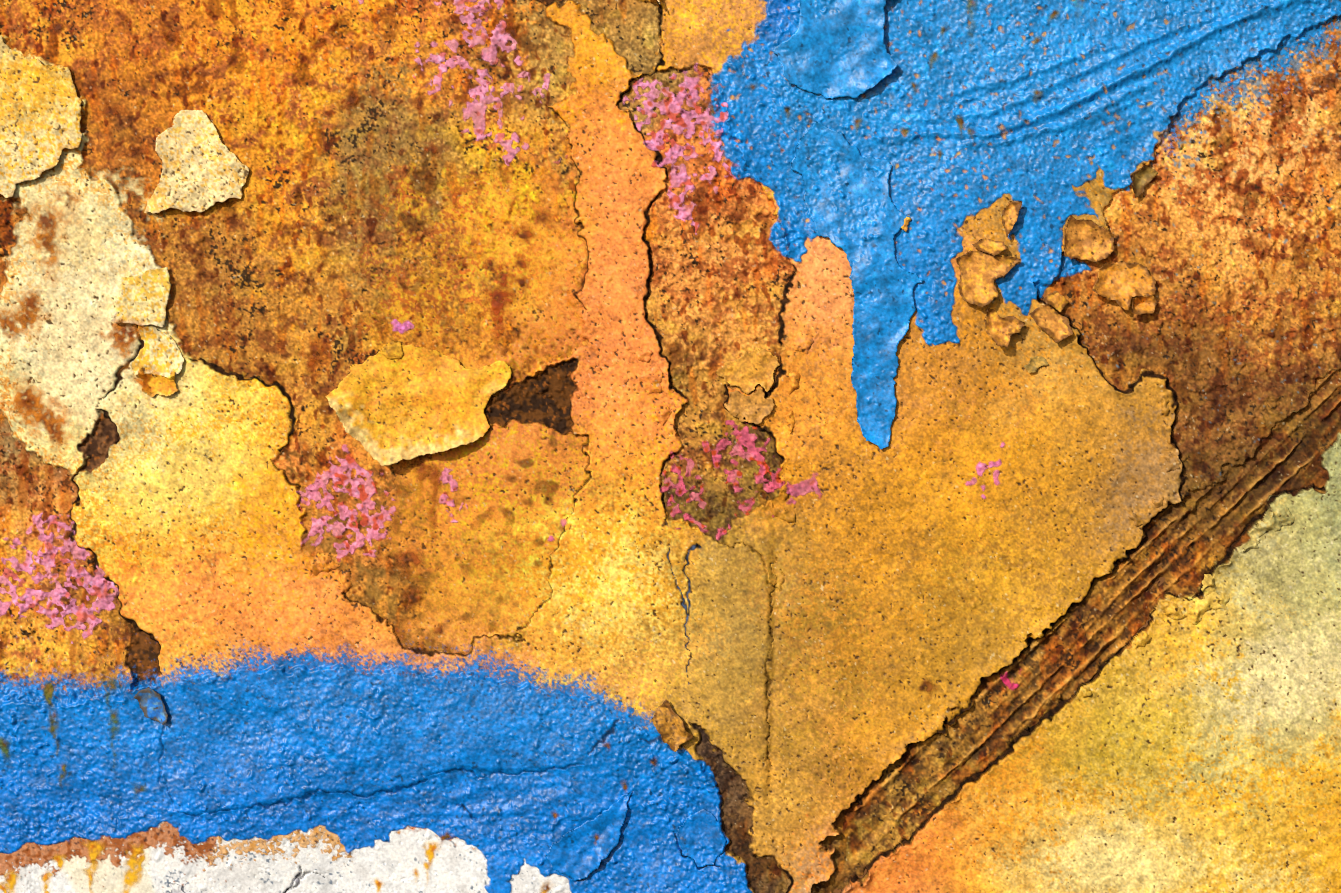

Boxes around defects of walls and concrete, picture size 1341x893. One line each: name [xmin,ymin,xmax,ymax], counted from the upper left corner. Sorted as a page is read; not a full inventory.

peeling [772,0,897,99]
corrosion [513,213,546,239]
corrosion [0,387,64,444]
corrosion [109,324,142,357]
corrosion [135,373,151,392]
spalling [0,0,798,653]
corrosion [483,260,527,337]
spalling [811,15,1341,893]
spalling [0,409,168,725]
crack [667,543,701,684]
spalling [651,700,791,893]
crack [285,867,324,892]